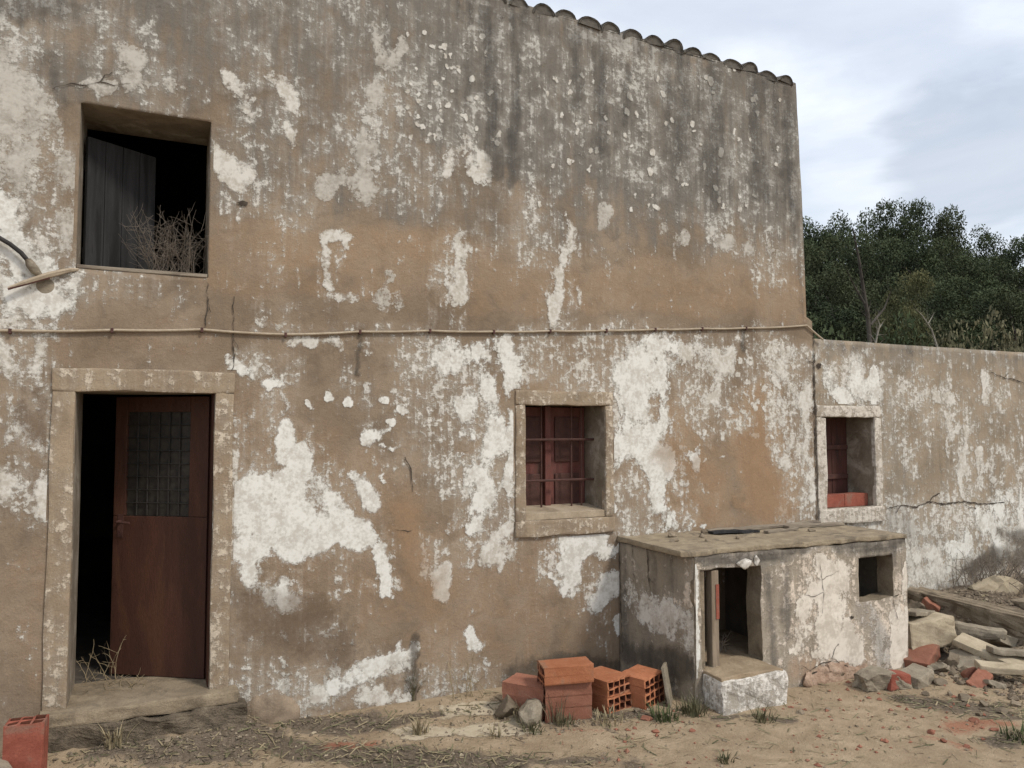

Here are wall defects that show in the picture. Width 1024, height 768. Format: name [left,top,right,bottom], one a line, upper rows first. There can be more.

crack [52,72,128,89]
peeling [0,40,81,387]
peeling [0,465,47,522]
peeling [233,418,396,615]
peeling [360,396,409,452]
peeling [419,333,524,603]
peeling [612,331,882,532]
crack [887,493,1005,513]
peeling [888,385,1024,669]
peeling [270,641,421,711]
peeling [547,534,700,678]
peeling [788,553,868,687]